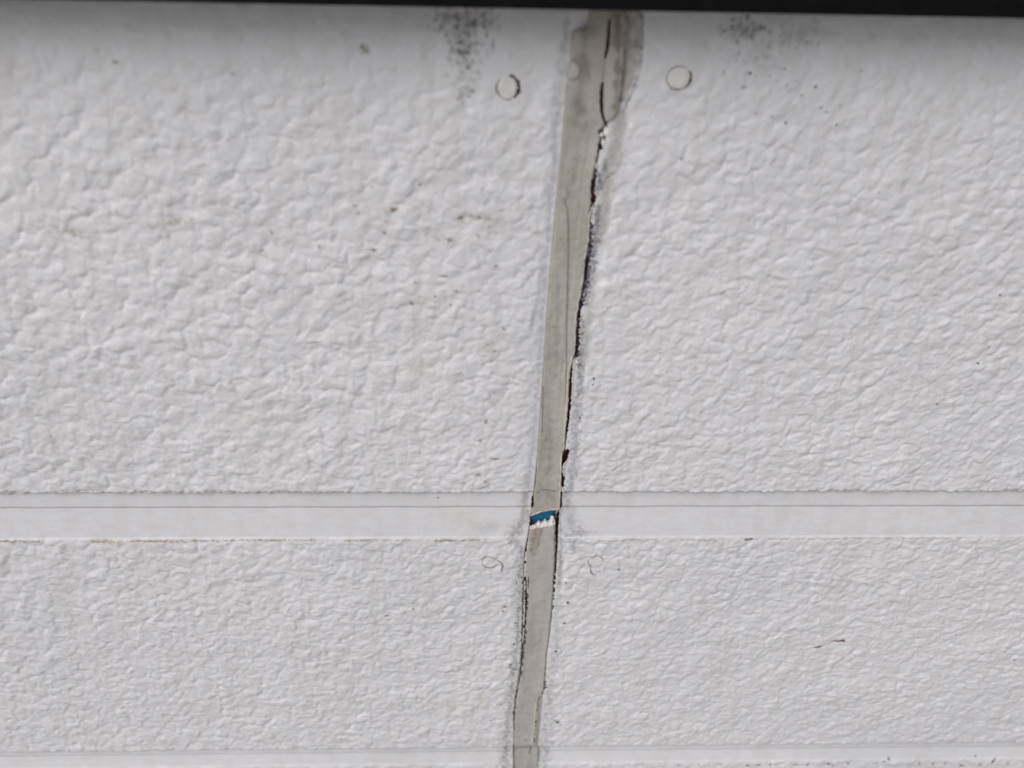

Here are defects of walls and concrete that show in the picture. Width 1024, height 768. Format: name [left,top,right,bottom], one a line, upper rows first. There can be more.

peeling [530,516,555,529]
crack [482,19,615,768]